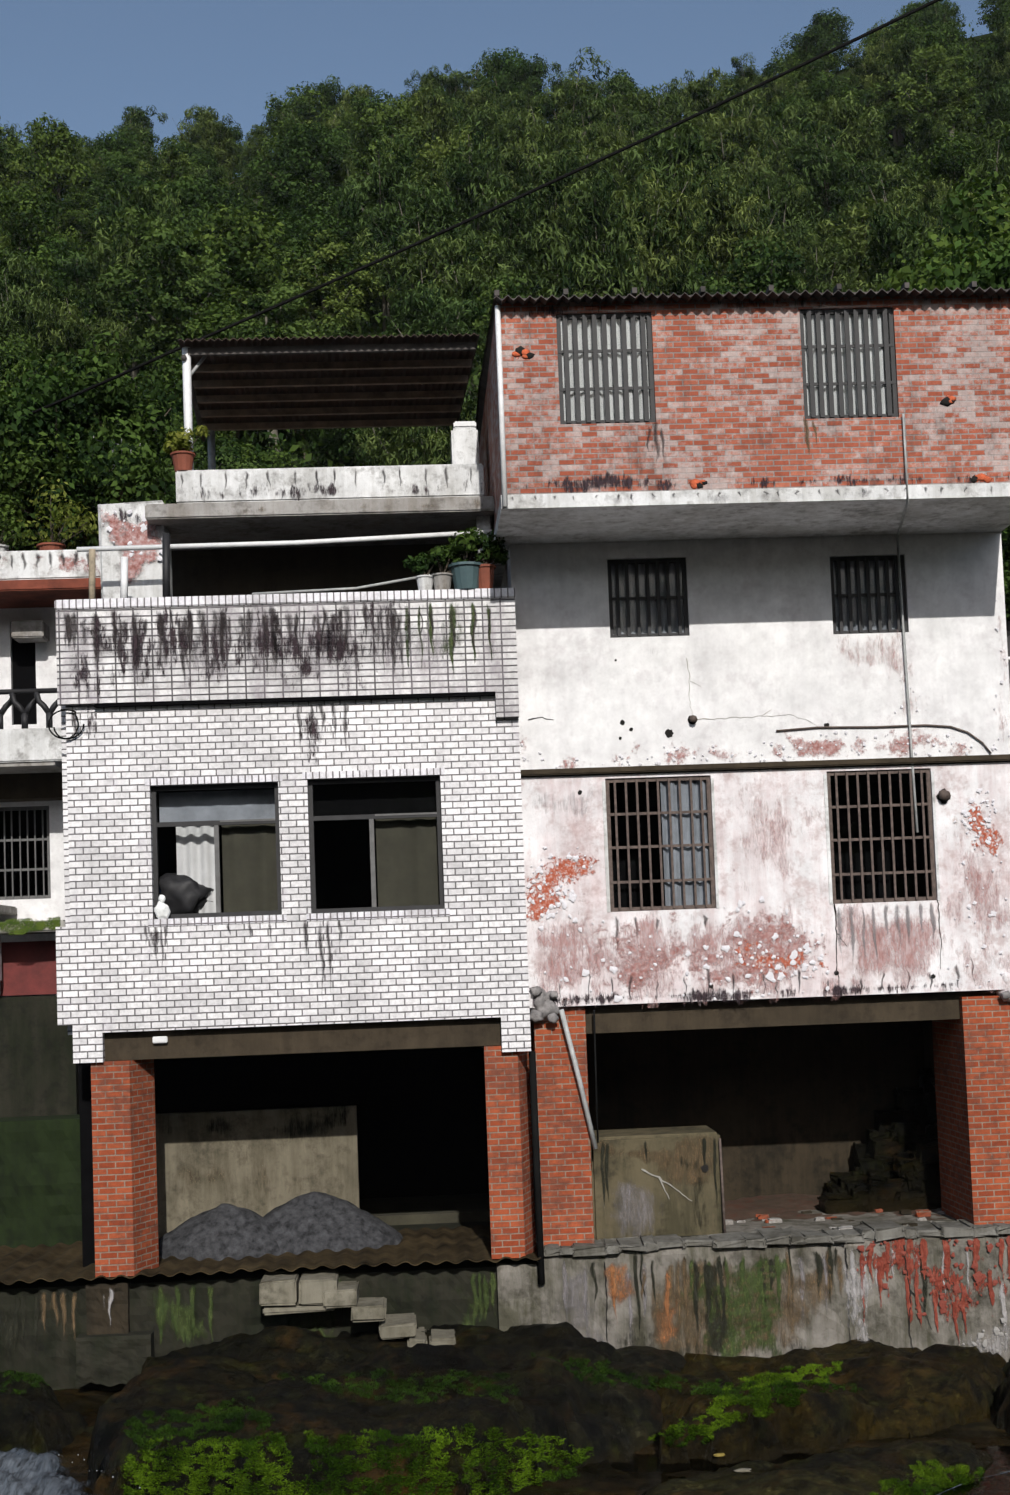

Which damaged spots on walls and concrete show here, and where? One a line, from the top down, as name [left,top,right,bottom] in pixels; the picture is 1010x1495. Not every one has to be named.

peeling [101,509,162,583]
damp [65,594,492,762]
peeling [520,680,1010,769]
damp [144,927,167,962]
damp [304,922,342,983]
damp [533,917,805,1008]
peeling [525,846,839,1003]
damp [823,904,975,997]
peeling [936,788,1008,988]
damp [625,1246,895,1355]
damp [916,1248,946,1312]
peeling [856,1234,1010,1355]